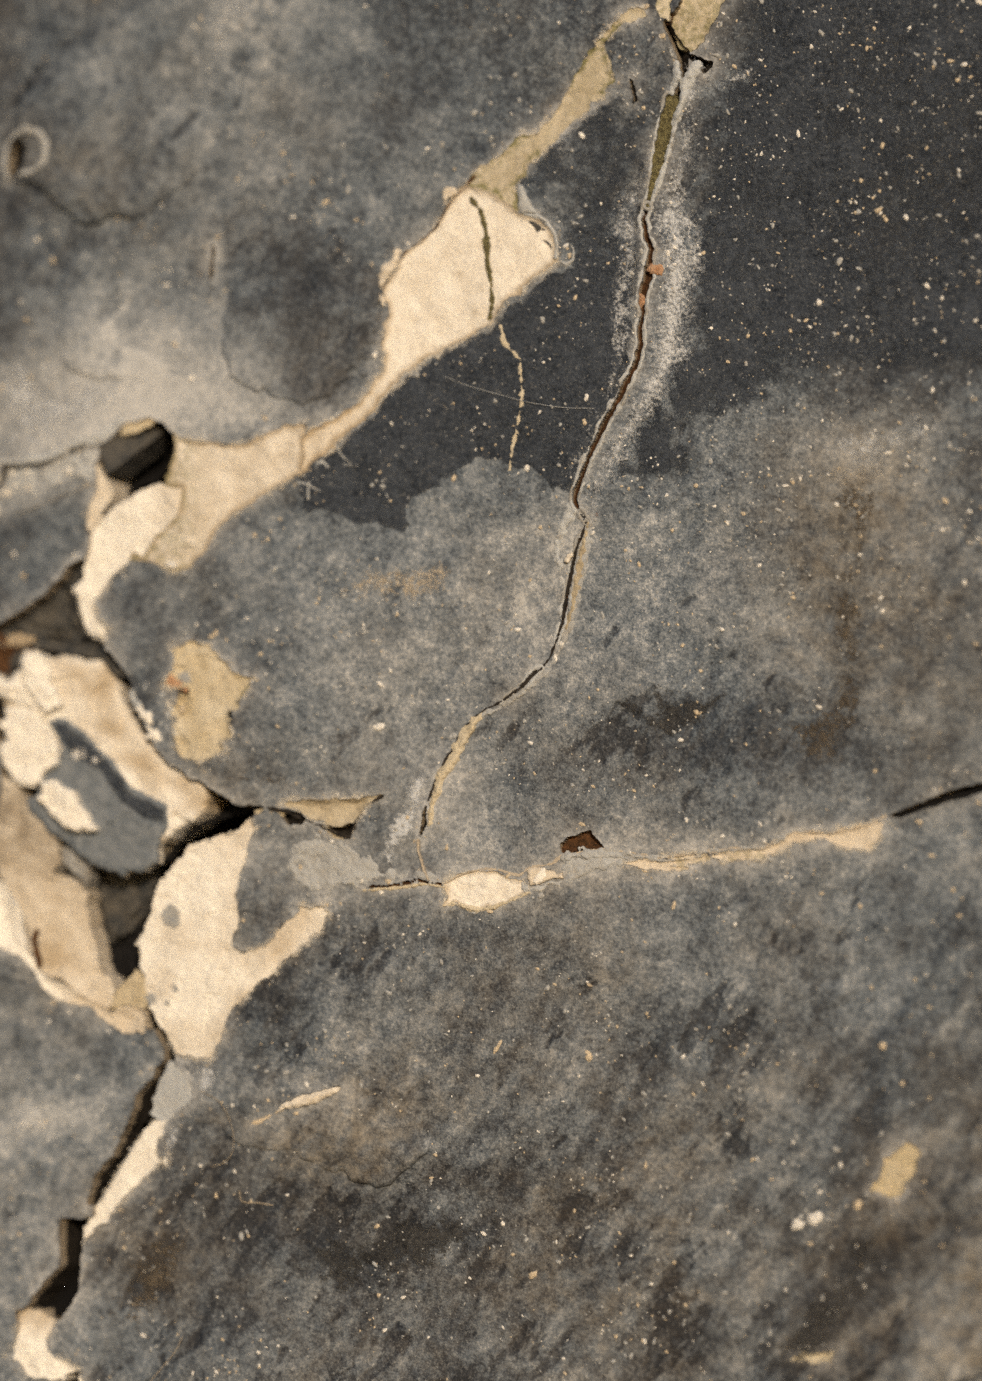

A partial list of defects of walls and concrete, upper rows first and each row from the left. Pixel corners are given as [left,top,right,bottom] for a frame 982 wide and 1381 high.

flaking render [72,4,647,643]
crack [163,0,982,913]
peeling [613,0,982,493]
flaking render [128,639,255,767]
flaking render [135,808,333,1064]
crack [3,1014,193,1381]
flaking render [870,1143,921,1198]